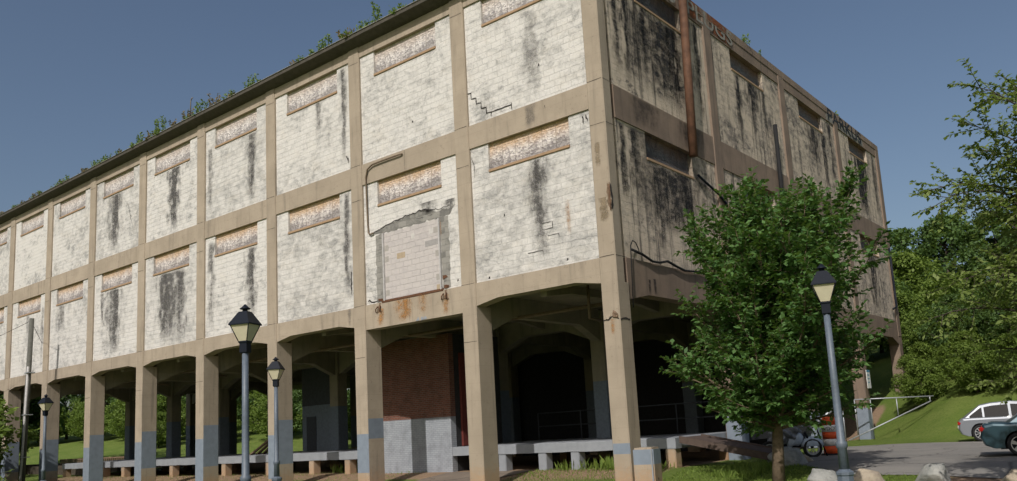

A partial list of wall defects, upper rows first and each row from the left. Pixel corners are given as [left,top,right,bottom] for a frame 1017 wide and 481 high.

water stain [611,0,684,100]
water stain [693,25,702,103]
crack [468,93,512,114]
water stain [735,75,765,129]
water stain [532,165,542,223]
water stain [619,123,699,244]
water stain [808,125,835,183]
water stain [854,159,878,207]
peeling [372,204,459,314]
water stain [101,290,118,340]
water stain [159,271,185,330]